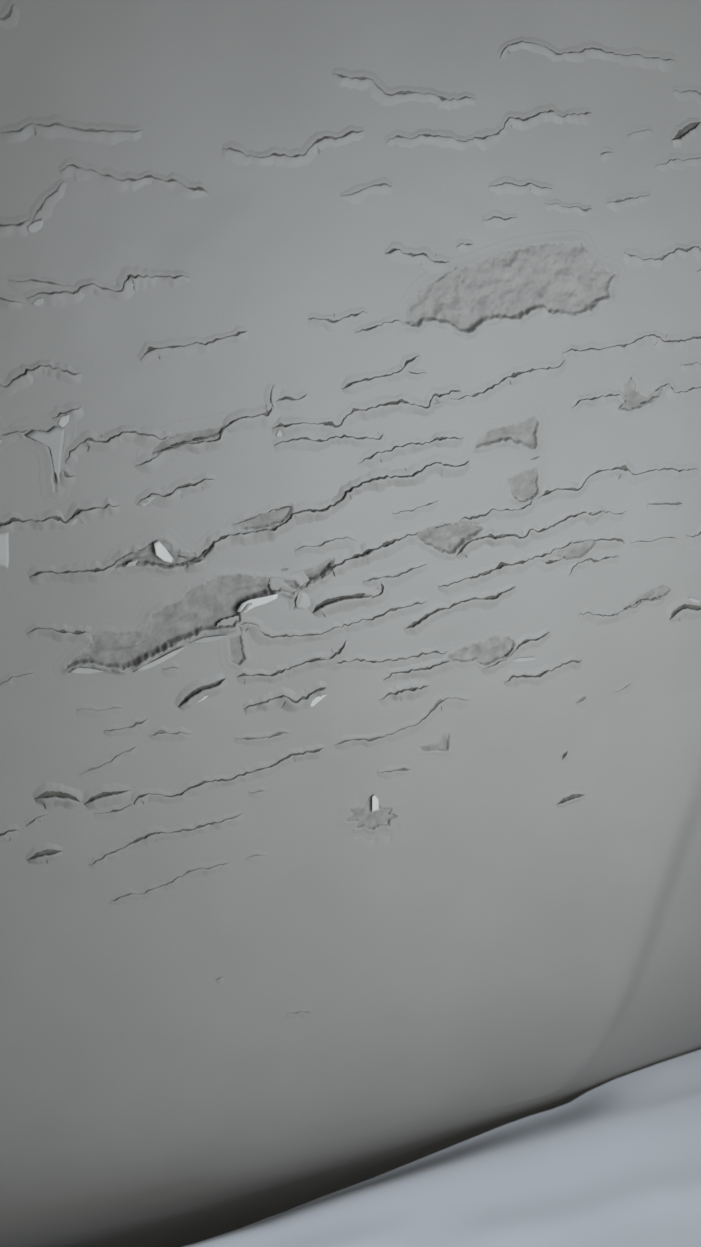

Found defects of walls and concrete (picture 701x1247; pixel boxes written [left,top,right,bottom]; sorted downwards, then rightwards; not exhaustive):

crack [0,0,20,29]
crack [497,36,701,104]
crack [0,114,210,238]
crack [222,67,592,274]
crack [0,266,189,311]
flaking render [397,230,625,345]
crack [623,240,701,277]
peeling [408,512,494,565]
peeling [53,493,342,679]
crack [0,307,701,907]
flaking render [336,785,407,840]